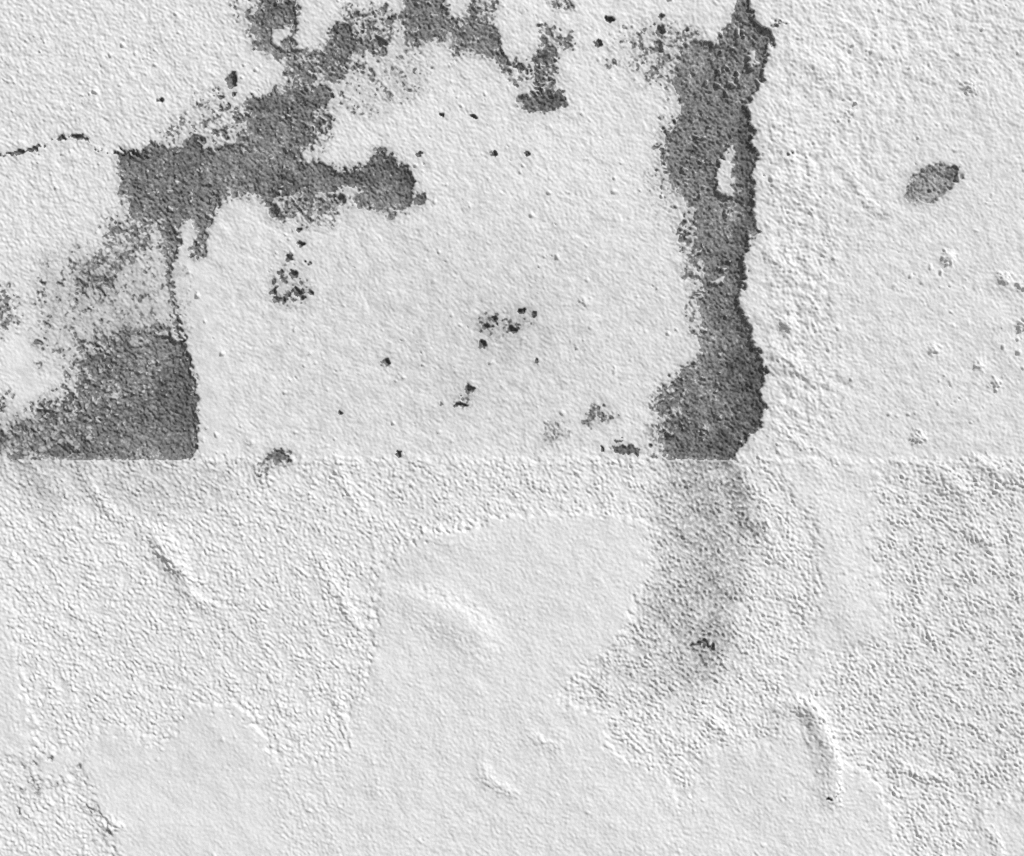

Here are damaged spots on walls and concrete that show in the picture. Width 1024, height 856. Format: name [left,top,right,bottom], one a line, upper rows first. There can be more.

crack [0,133,149,165]
peeling [0,0,576,460]
peeling [604,0,787,460]
spalling [903,161,964,204]